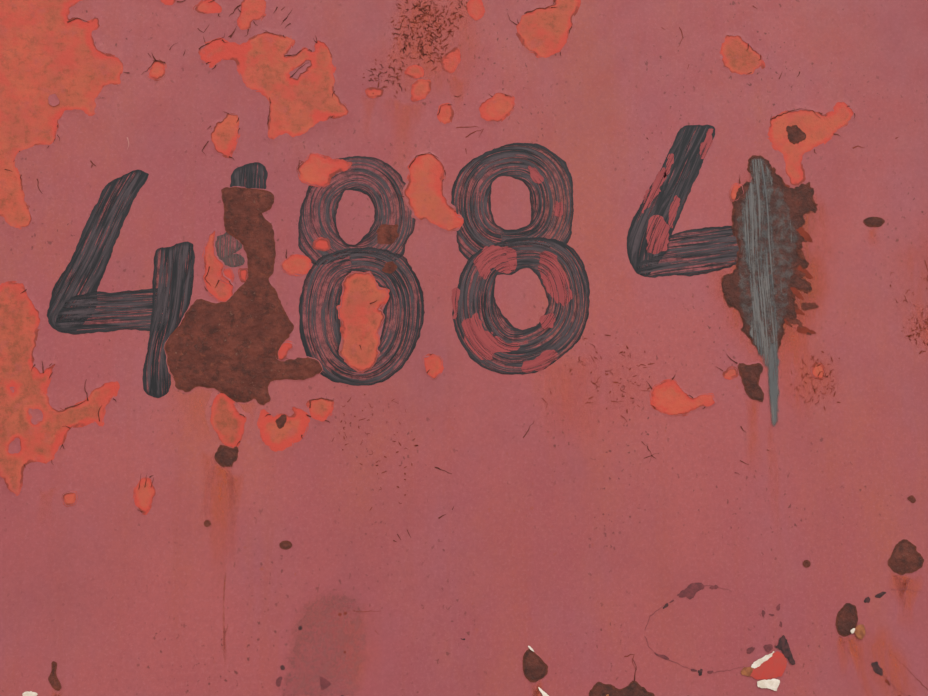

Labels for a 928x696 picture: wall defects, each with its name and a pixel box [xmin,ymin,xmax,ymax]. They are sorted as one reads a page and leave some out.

peeling [0,0,130,234]
peeling [156,0,355,144]
peeling [296,152,353,188]
peeling [399,149,465,234]
peeling [763,96,860,188]
rust [164,186,324,406]
peeling [336,271,390,373]
rust [721,155,819,404]
peeling [0,276,124,501]
rust [886,537,926,605]
rust [586,660,656,696]
peeling [741,604,795,691]